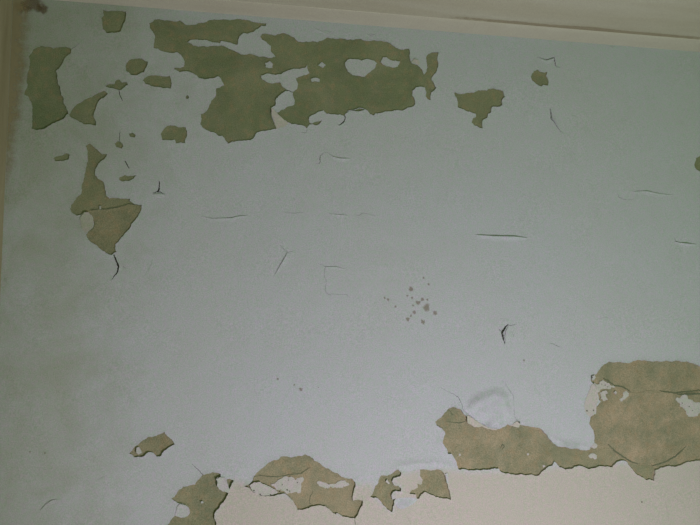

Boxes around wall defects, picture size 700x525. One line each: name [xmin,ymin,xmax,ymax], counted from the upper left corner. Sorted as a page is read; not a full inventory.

peeling [24,19,438,143]
peeling [454,88,504,128]
peeling [70,144,142,255]
crack [112,254,125,279]
crack [501,324,514,343]
peeling [435,360,700,480]
peeling [130,432,174,457]
peeling [168,464,230,525]
peeling [246,454,362,519]
peeling [370,470,401,512]
peeling [410,469,450,499]